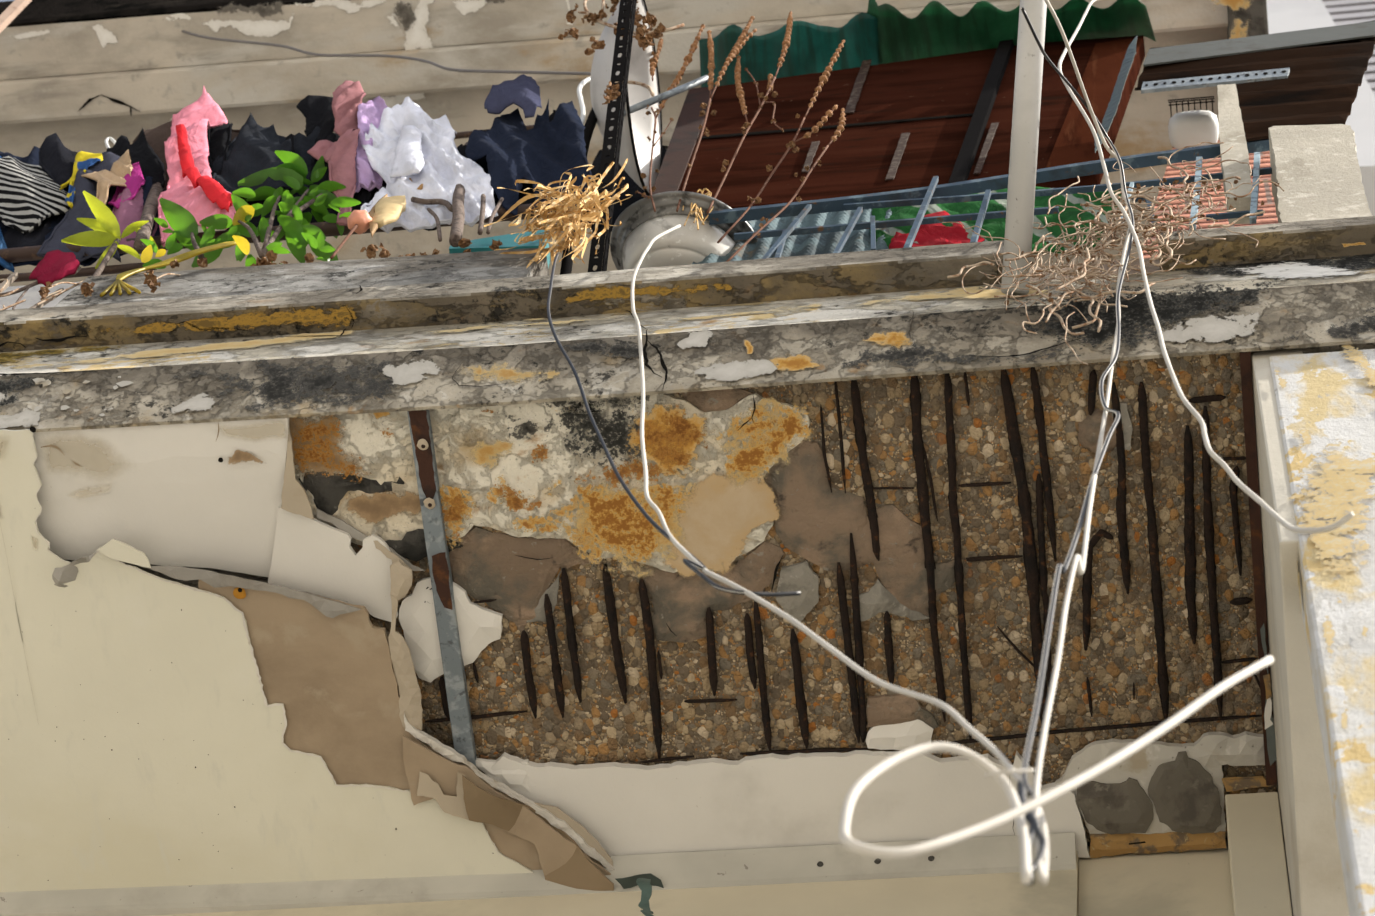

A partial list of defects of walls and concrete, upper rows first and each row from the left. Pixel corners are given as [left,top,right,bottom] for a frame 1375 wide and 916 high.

peeling [171,392,215,413]
damp [0,330,403,482]
peeling [382,359,440,385]
damp [431,318,607,333]
mould [497,395,650,467]
damp [563,340,639,358]
crack [626,310,668,387]
damp [842,254,1375,372]
rust [346,399,812,610]
peeling [1289,429,1375,582]
flaking render [293,411,454,749]
spalling [429,312,1277,867]